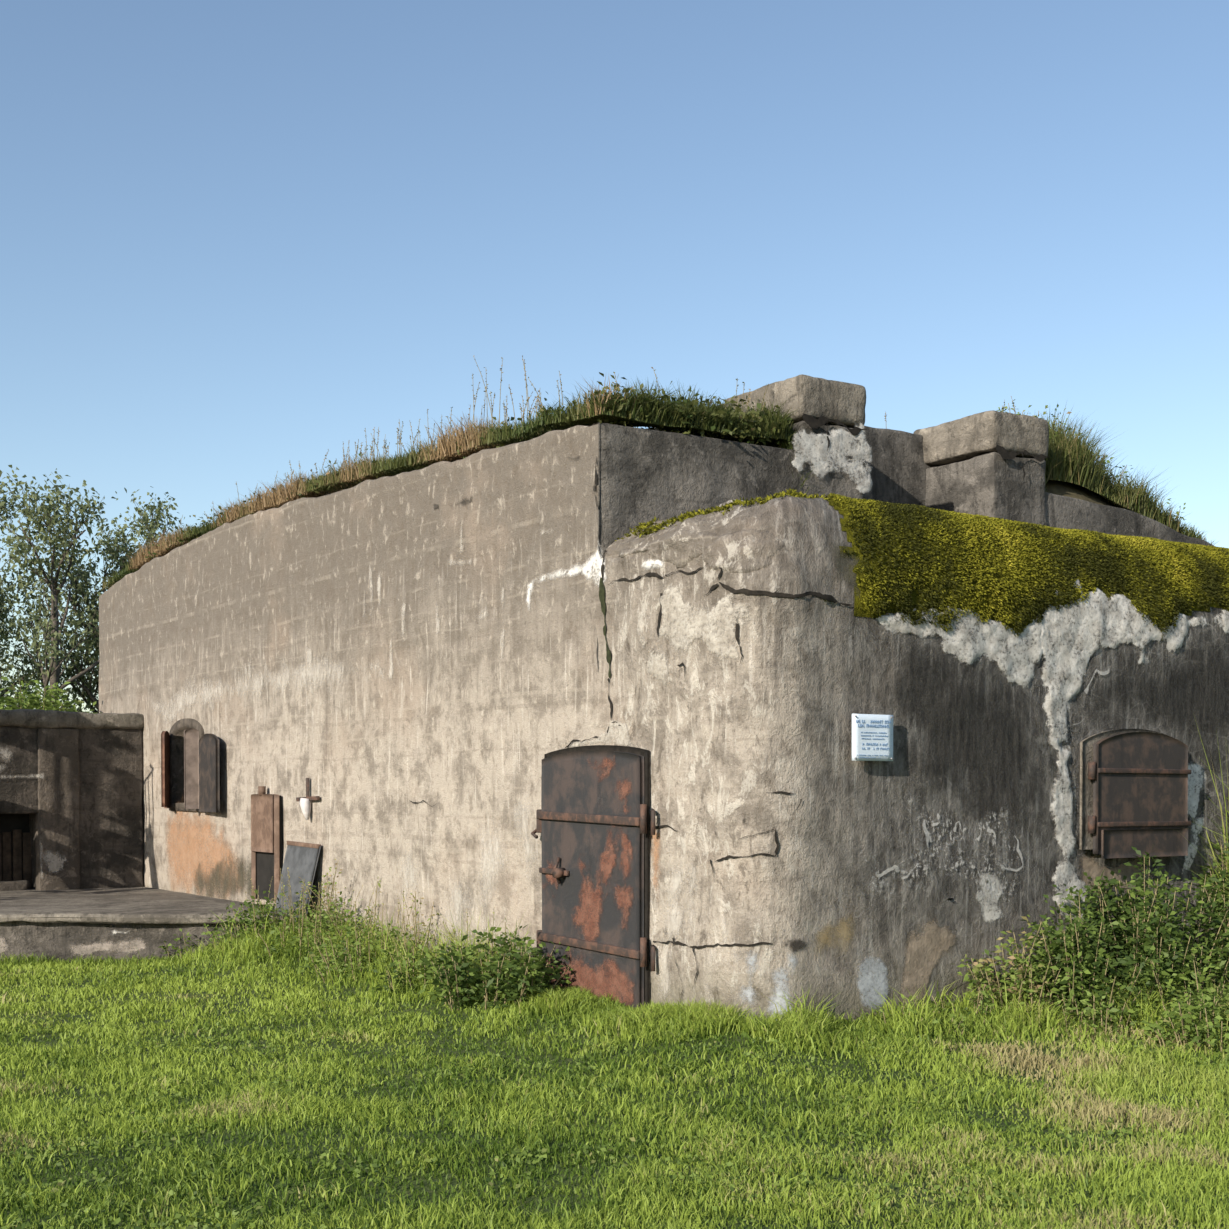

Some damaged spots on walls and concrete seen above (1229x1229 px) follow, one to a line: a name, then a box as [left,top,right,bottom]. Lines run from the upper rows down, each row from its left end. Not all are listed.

peeling [792,423,873,493]
damp [527,550,606,605]
crack [565,550,851,748]
peeling [876,578,1229,924]
crack [710,791,802,877]
rust [573,834,633,941]
rust [547,955,633,1006]
crack [653,938,774,995]